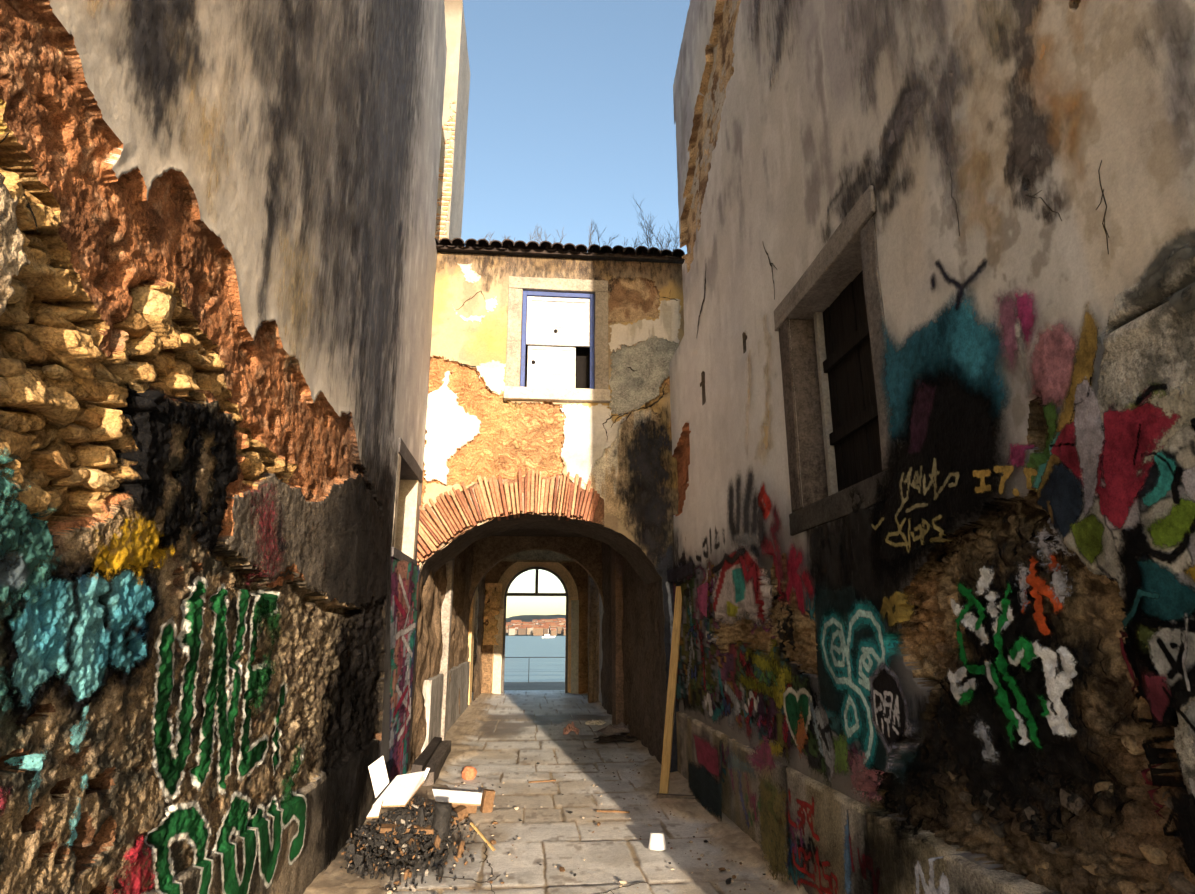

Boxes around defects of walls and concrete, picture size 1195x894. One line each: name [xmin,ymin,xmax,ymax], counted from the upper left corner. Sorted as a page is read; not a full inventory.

damp [236,0,424,463]
peeling [457,263,481,283]
spalling [608,277,681,352]
spalling [680,0,741,273]
damp [751,0,788,62]
damp [875,73,958,215]
damp [979,0,1072,223]
crack [1096,160,1109,254]
damp [1123,230,1195,317]
spalling [0,0,365,894]
spalling [418,356,670,572]
spalling [870,490,1195,894]